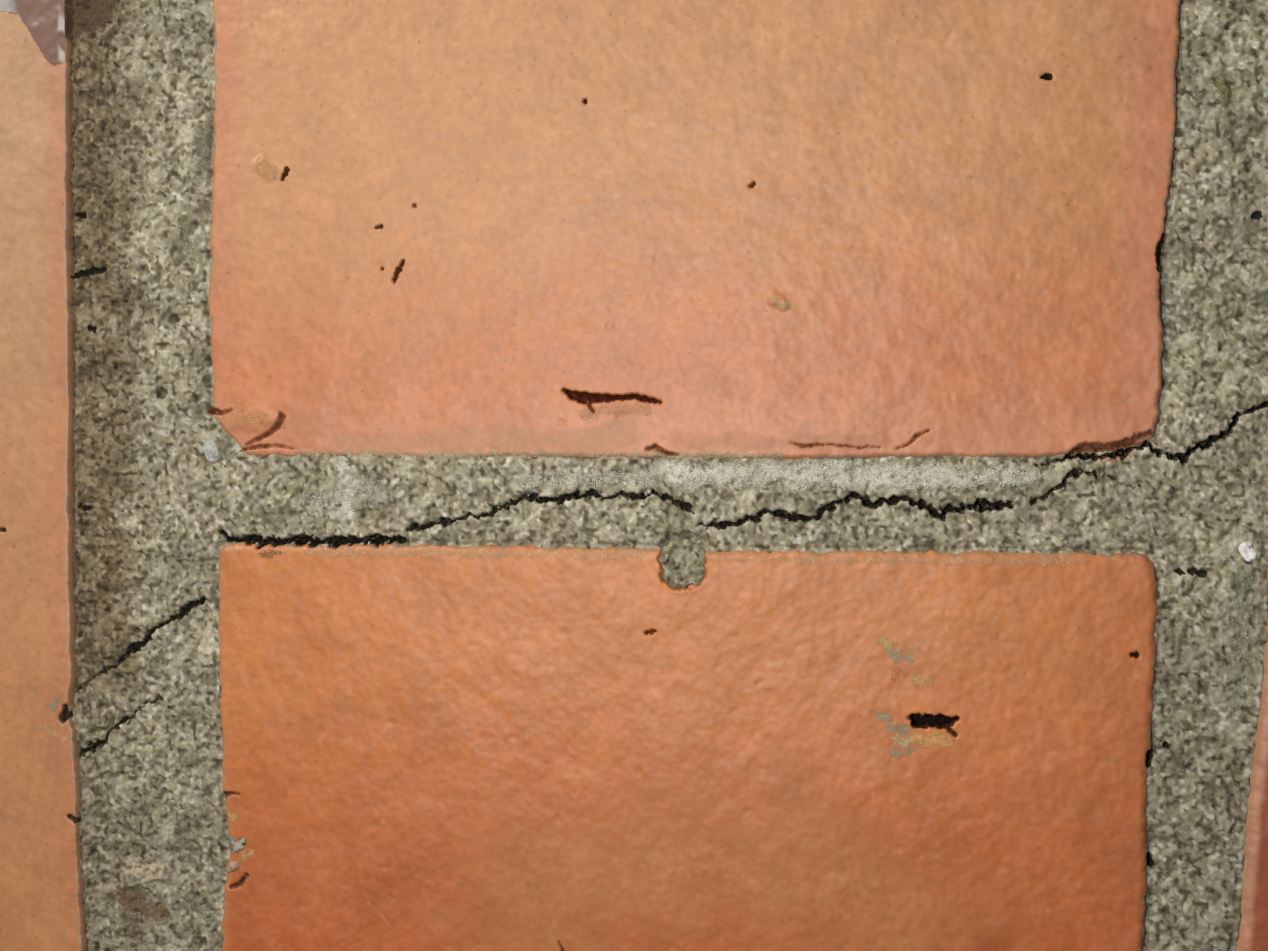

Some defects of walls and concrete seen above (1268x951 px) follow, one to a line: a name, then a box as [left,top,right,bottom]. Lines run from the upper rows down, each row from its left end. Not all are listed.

spalling [208,403,294,452]
crack [218,401,1268,549]
crack [76,597,206,692]
spalling [873,635,934,687]
crack [79,694,175,758]
spalling [875,710,959,758]